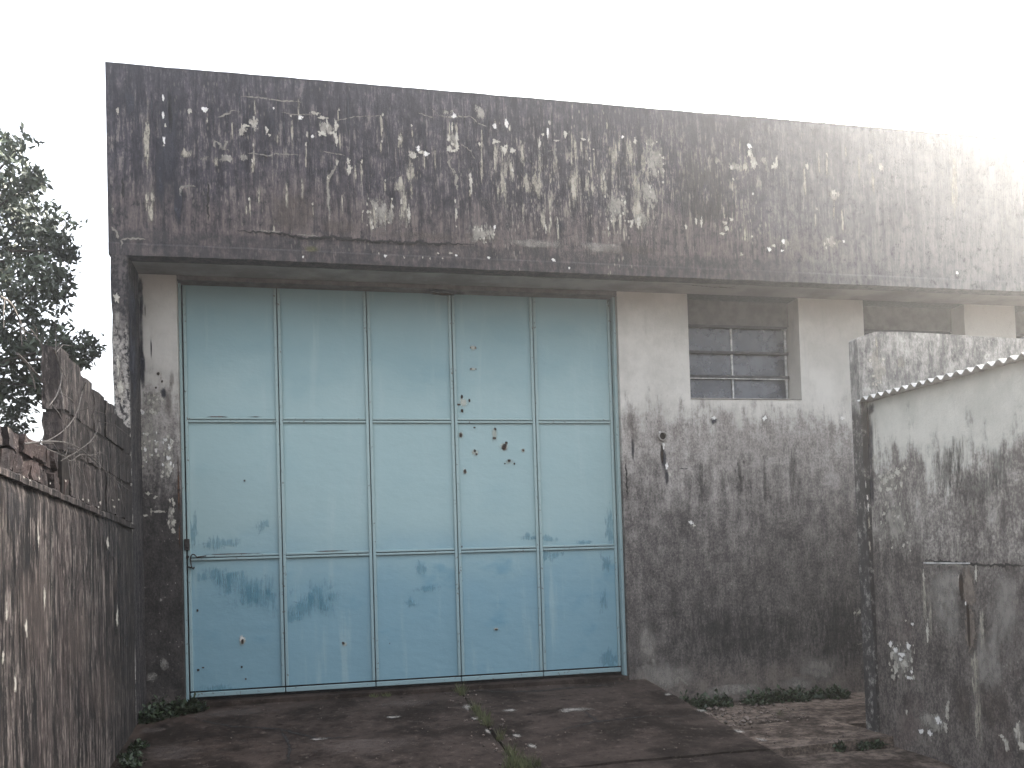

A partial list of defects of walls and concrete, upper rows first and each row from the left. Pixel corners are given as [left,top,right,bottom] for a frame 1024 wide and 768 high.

peeling [238,100,271,136]
peeling [298,111,339,146]
peeling [441,104,510,152]
leakage [143,91,183,225]
crack [238,150,474,246]
leakage [383,175,413,223]
peeling [398,133,430,182]
leakage [469,104,649,253]
leakage [660,443,671,484]
crack [926,559,1024,568]
peeling [887,641,915,680]
leakage [971,580,1015,746]